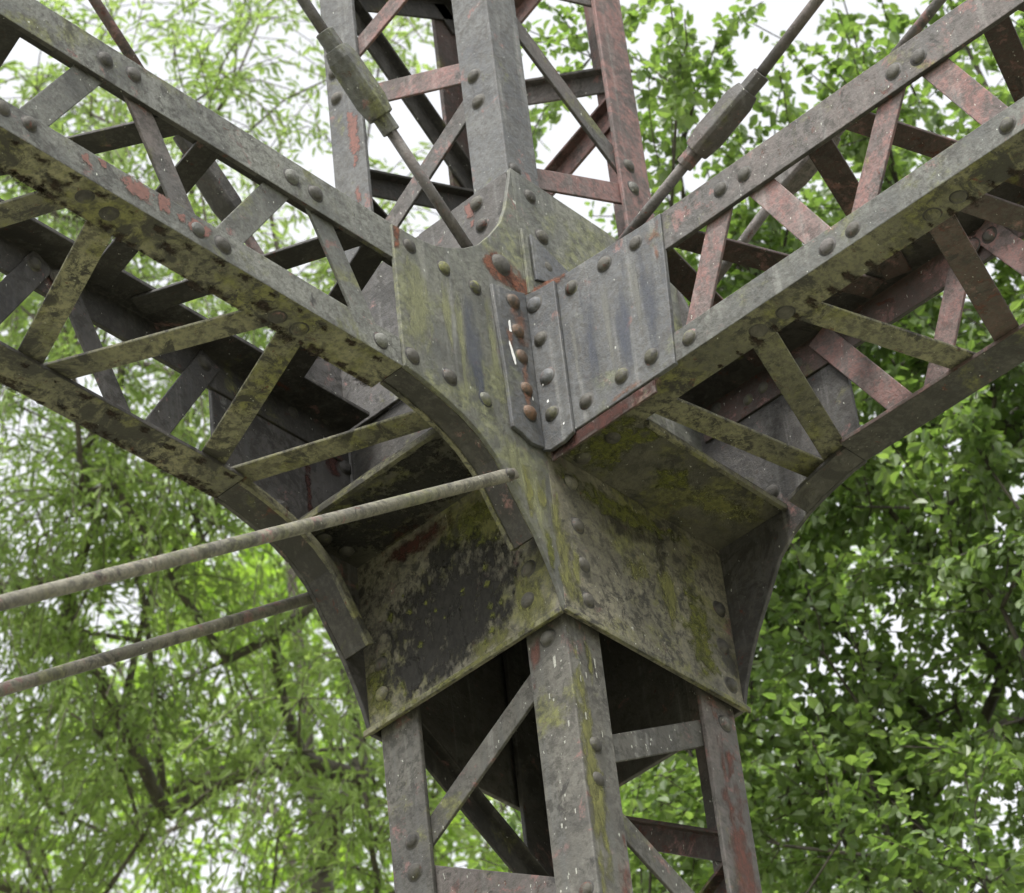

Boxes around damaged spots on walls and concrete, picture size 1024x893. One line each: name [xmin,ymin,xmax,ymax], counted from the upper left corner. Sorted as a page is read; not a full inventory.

rust [0,154,193,263]
rust [483,252,564,295]
rust [181,275,370,387]
leakage [350,438,472,507]
leakage [320,495,457,551]
rust [383,515,452,567]
leakage [379,526,524,702]